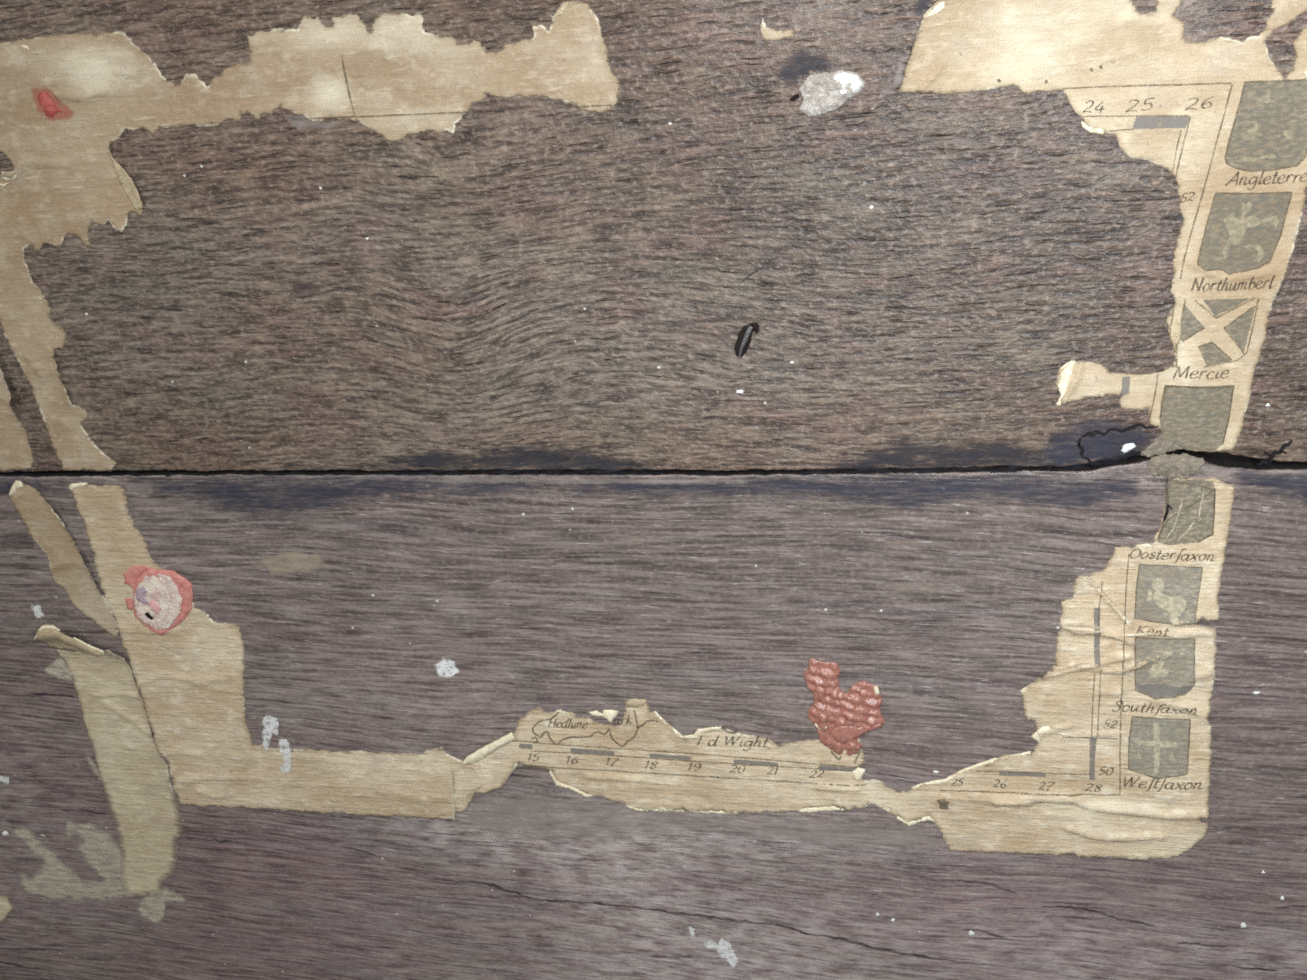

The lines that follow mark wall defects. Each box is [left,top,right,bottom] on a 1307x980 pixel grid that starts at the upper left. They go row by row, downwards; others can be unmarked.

peeling [760,18,794,41]
spalling [734,323,754,359]
crack [1257,440,1293,465]
peeling [0,896,13,922]
crack [432,879,1003,966]